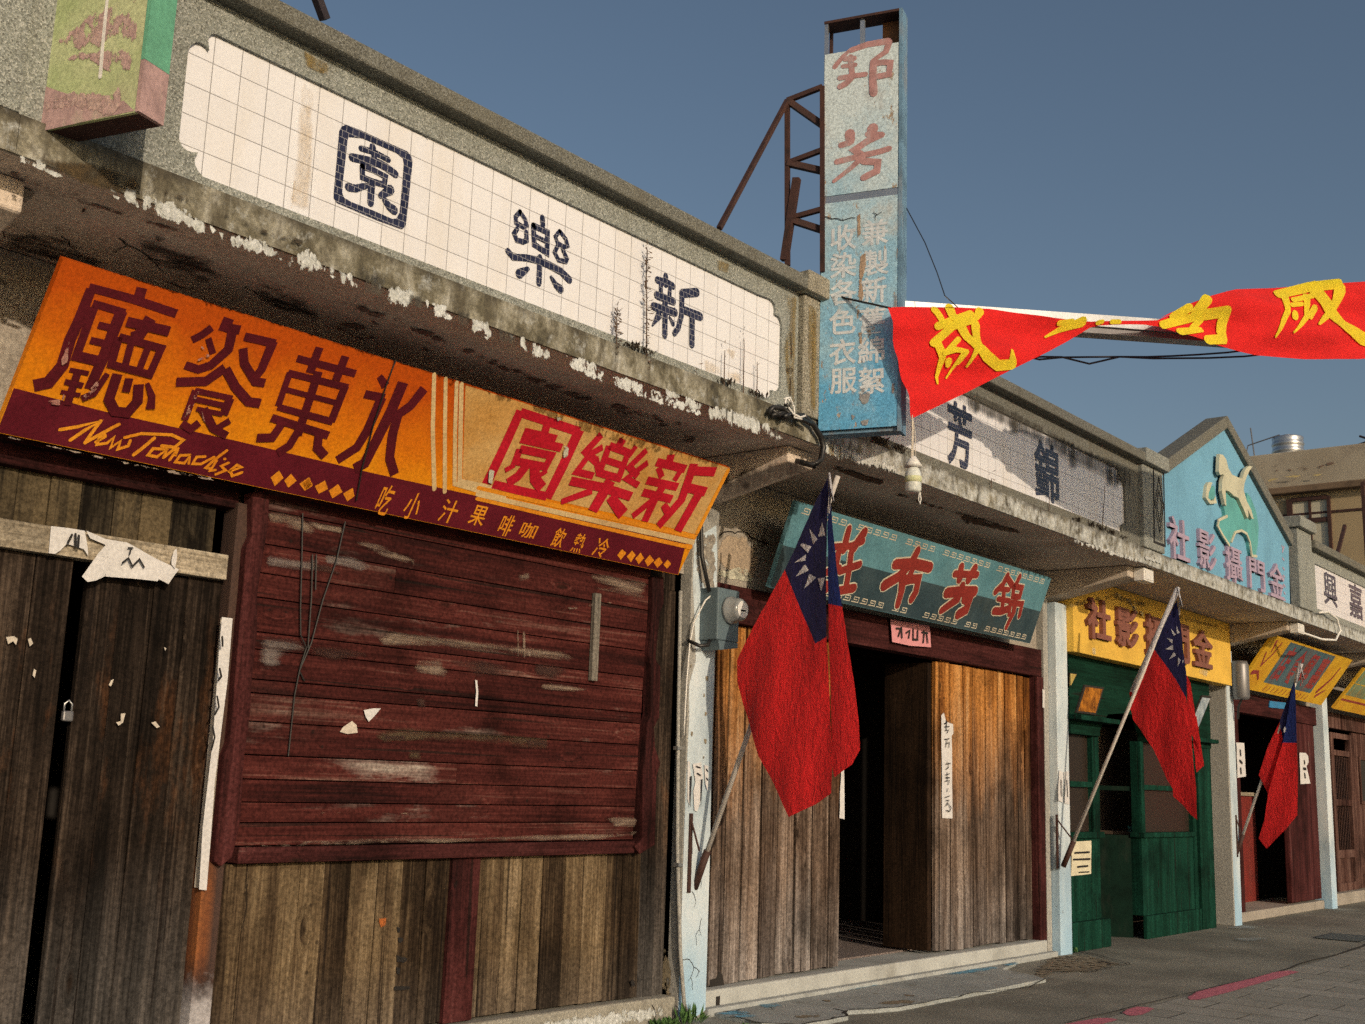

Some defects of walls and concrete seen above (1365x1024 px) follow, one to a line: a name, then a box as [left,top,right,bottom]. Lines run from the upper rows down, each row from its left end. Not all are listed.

peeling [78,188,357,287]
peeling [545,1007,663,1024]
crack [683,892,702,990]
crack [730,951,1130,1024]